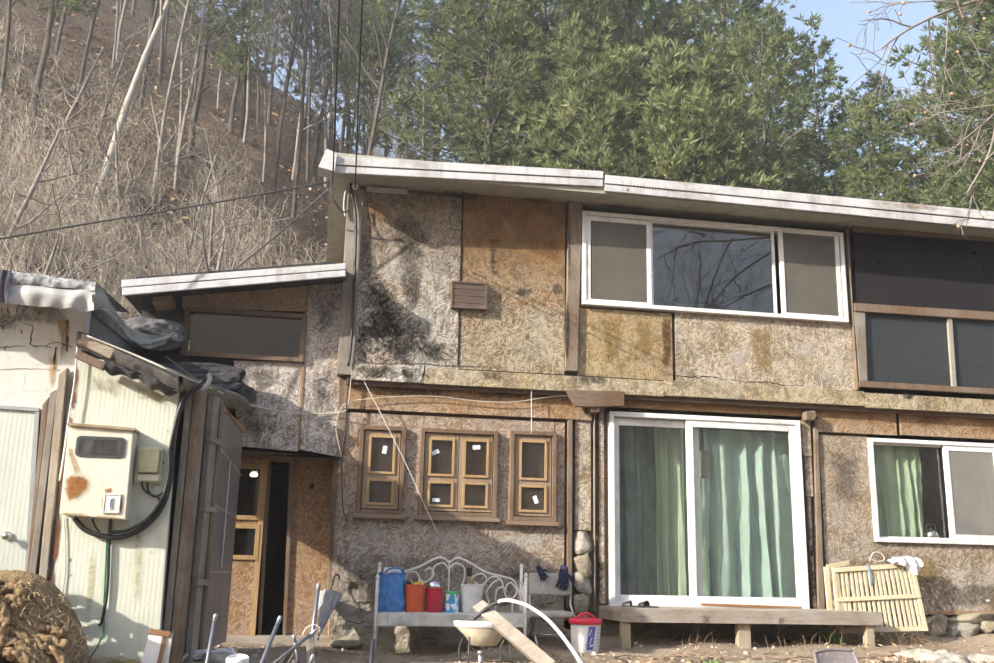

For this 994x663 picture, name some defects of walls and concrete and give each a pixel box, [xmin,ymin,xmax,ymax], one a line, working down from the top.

crack [0,323,72,370]
damp [357,246,442,395]
corrosion [52,369,87,561]